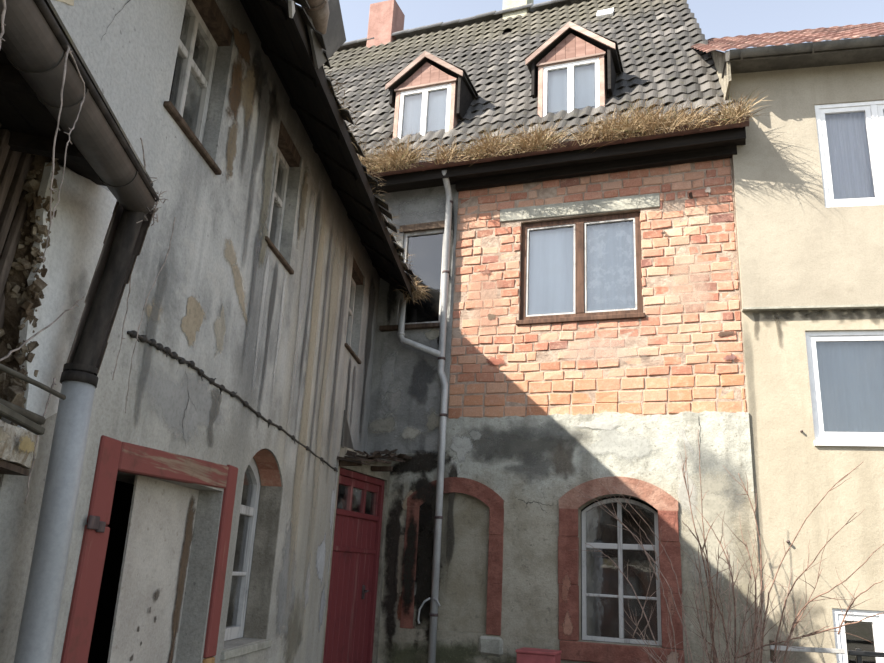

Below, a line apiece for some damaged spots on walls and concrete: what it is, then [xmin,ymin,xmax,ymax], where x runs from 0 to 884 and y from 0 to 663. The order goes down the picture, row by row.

flaking render [227,26,256,178]
leakage [242,52,286,399]
flaking render [181,296,205,346]
flaking render [225,241,247,321]
leakage [754,308,884,340]
leakage [380,353,437,411]
leakage [277,196,375,663]
leakage [474,424,581,479]
leakage [381,450,457,650]